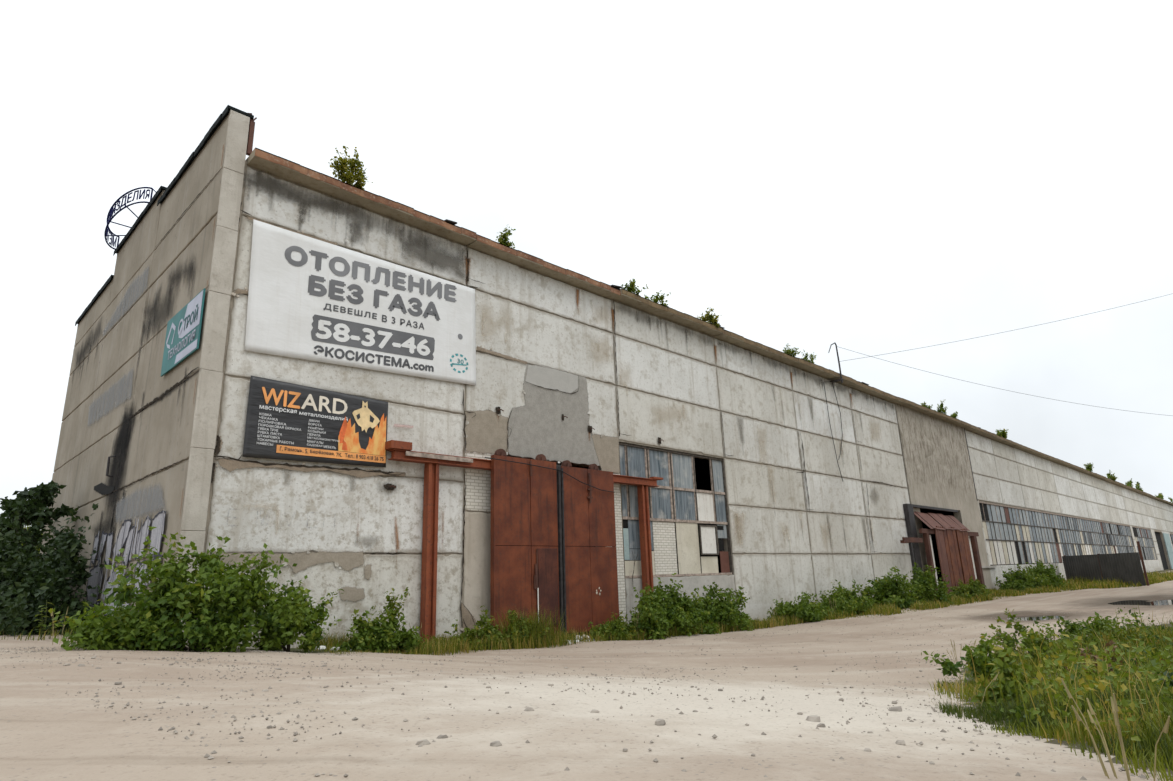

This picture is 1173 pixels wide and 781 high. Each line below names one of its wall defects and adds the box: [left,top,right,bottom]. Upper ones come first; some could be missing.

leakage [73,262,197,424]
peeling [464,345,620,473]
leakage [92,487,163,549]
peeling [205,551,371,602]